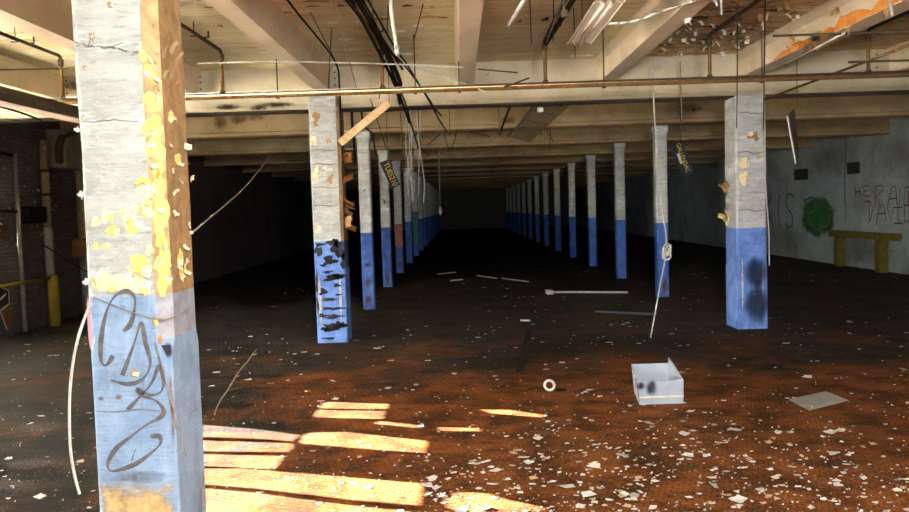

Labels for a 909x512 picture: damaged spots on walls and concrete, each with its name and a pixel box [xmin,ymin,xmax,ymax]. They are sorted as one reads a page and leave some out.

crack [72,31,139,55]
peeling [647,0,800,56]
peeling [774,0,902,60]
peeling [82,35,194,297]
peeling [739,153,762,186]
peeling [314,225,349,340]
leakage [747,259,767,320]
peeling [102,486,172,512]